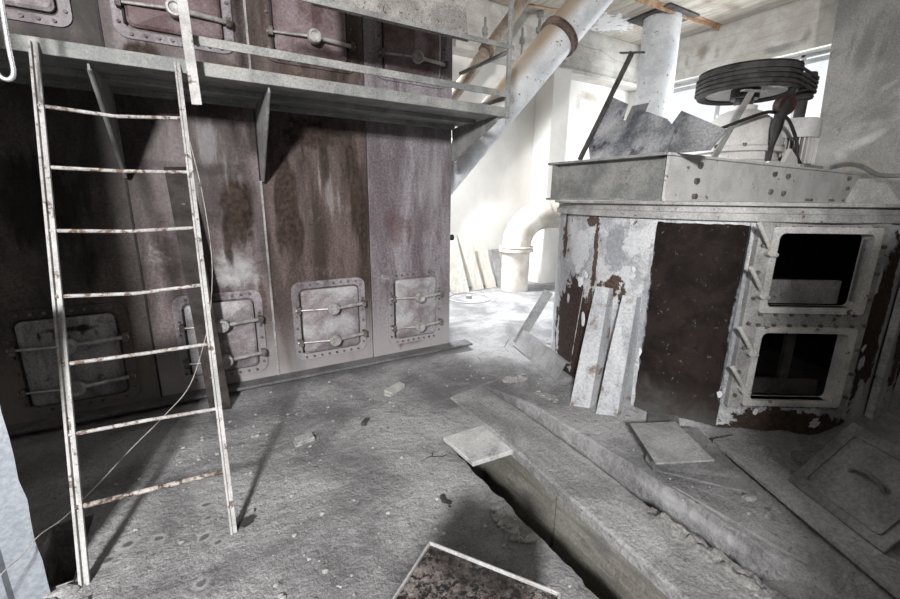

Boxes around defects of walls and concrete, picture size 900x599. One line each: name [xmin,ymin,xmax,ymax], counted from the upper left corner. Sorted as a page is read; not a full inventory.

damp [217,254,259,286]
peeling [555,228,591,378]
peeling [605,220,653,363]